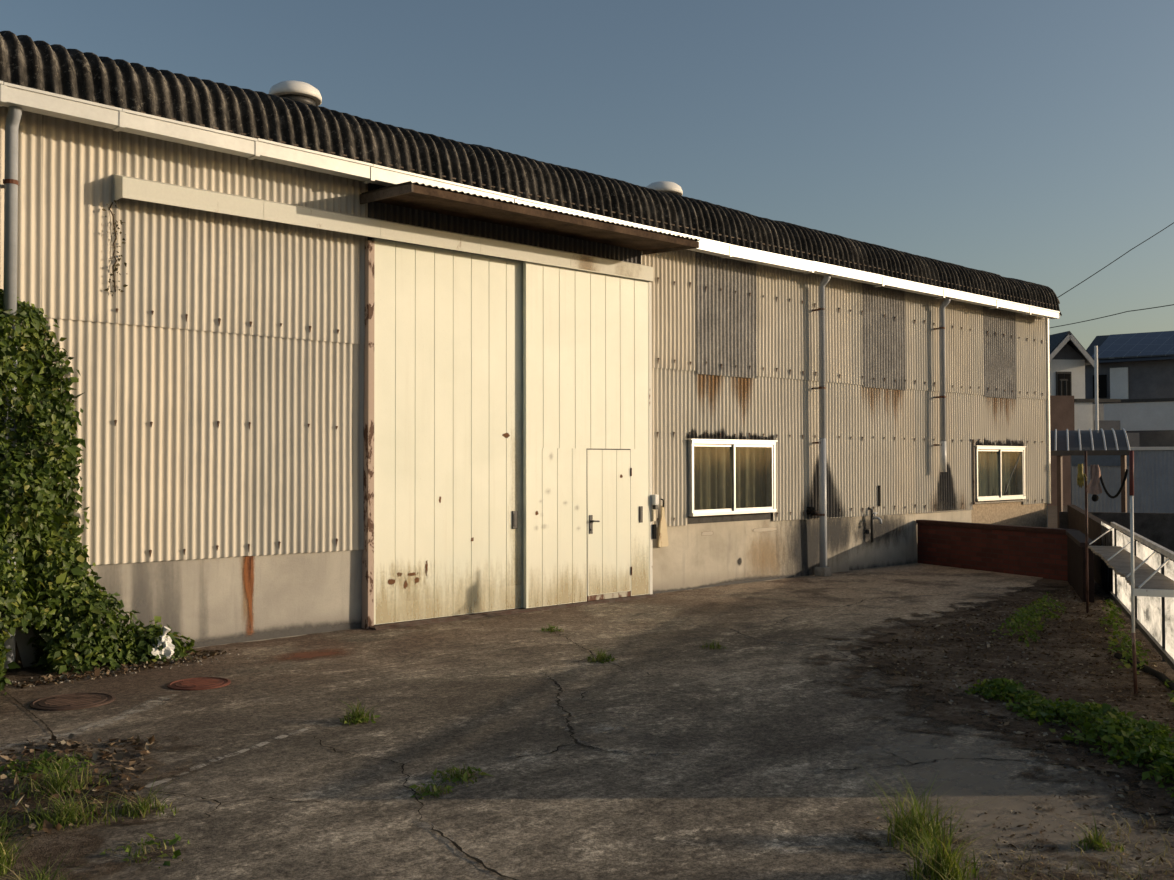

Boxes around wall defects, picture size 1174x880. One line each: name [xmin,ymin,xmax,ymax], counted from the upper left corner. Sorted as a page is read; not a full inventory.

rust [690,362,722,400]
rust [734,365,817,410]
mould [686,430,774,440]
leakage [790,459,904,577]
rust [243,544,254,634]
crack [308,733,517,880]